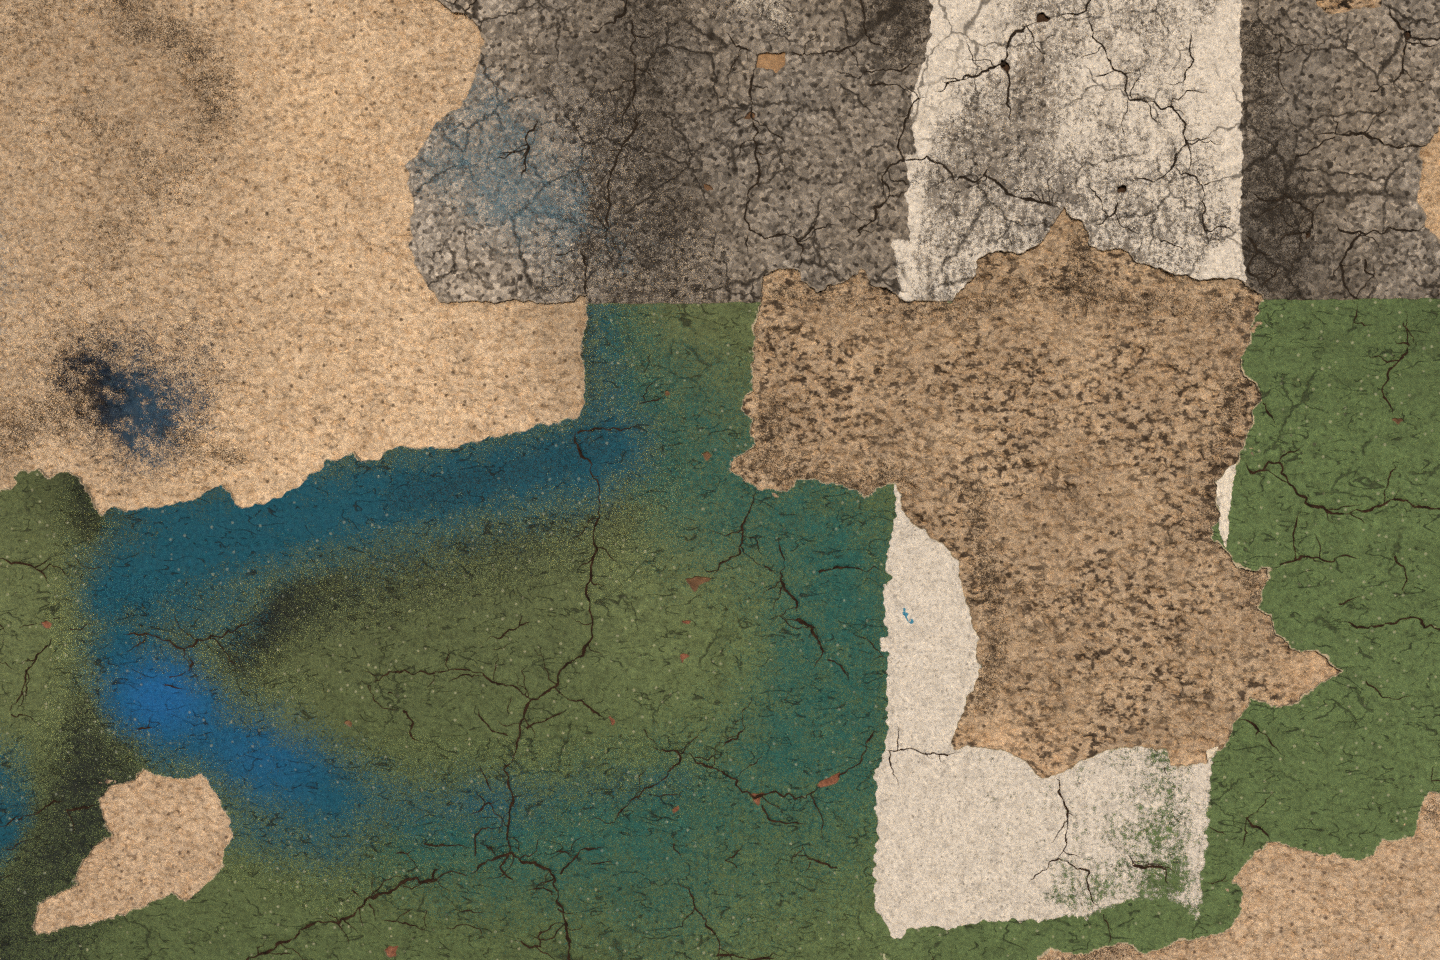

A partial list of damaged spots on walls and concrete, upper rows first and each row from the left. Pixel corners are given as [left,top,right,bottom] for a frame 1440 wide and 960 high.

flaking render [1316,0,1382,14]
flaking render [0,0,588,514]
crack [491,121,538,181]
crack [556,0,658,299]
crack [727,0,1440,413]
flaking render [1417,126,1440,240]
flaking render [731,207,1341,778]
crack [1247,403,1440,568]
crack [0,617,255,724]
crack [246,373,956,960]
flaking render [35,770,233,933]
flaking render [1038,792,1440,960]